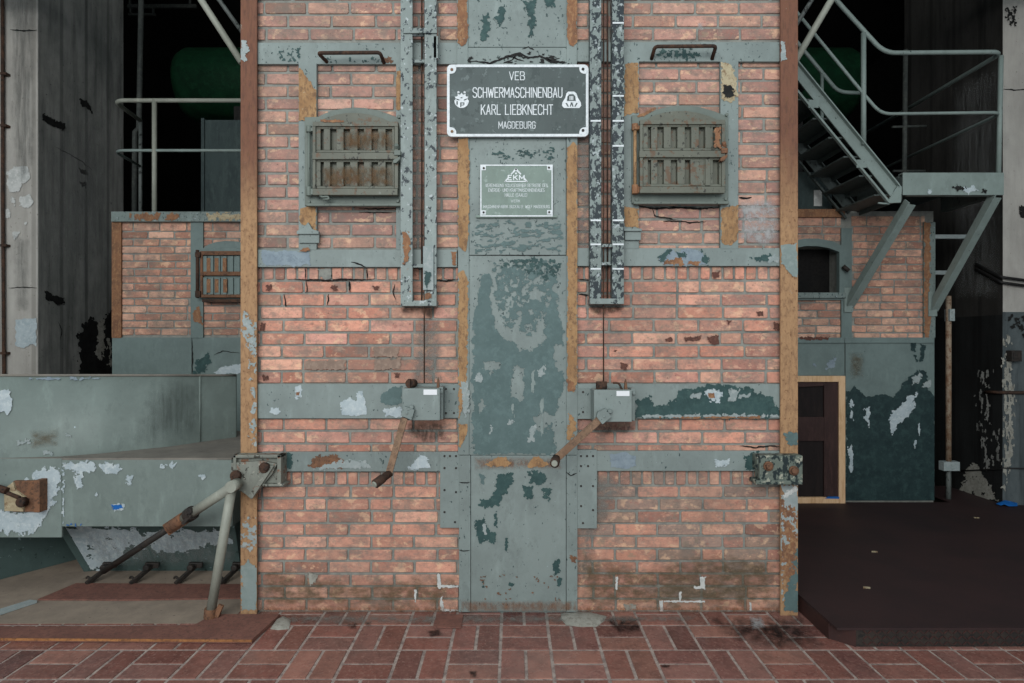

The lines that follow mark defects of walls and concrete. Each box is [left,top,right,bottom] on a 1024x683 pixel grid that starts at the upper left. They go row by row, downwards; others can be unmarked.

peeling [5,166,34,218]
crack [640,197,751,224]
peeling [460,220,565,456]
peeling [635,383,780,421]
peeling [846,343,934,500]
peeling [0,450,257,611]
peeling [474,470,552,551]
peeling [552,559,562,586]
peeling [781,485,798,612]